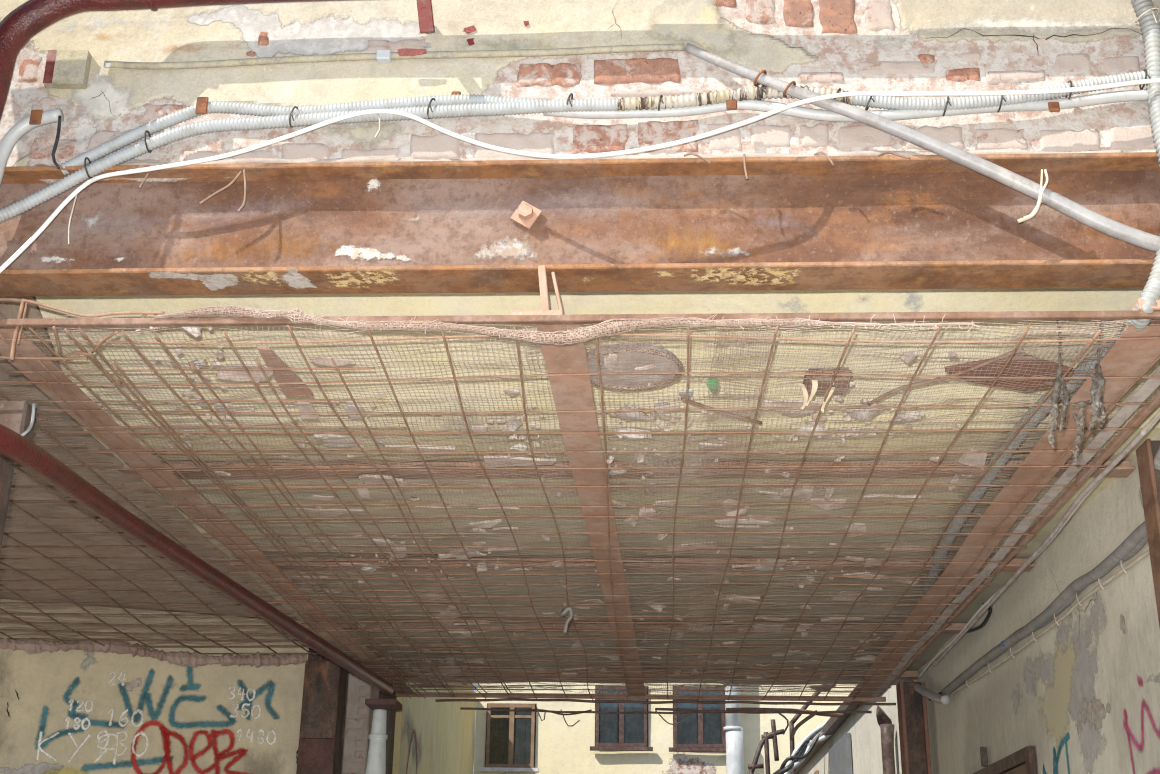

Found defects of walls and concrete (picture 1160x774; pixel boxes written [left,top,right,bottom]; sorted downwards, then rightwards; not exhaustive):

spalling [0,0,1156,184]
peeling [368,179,382,192]
spalling [662,752,719,774]
peeling [1013,592,1111,774]